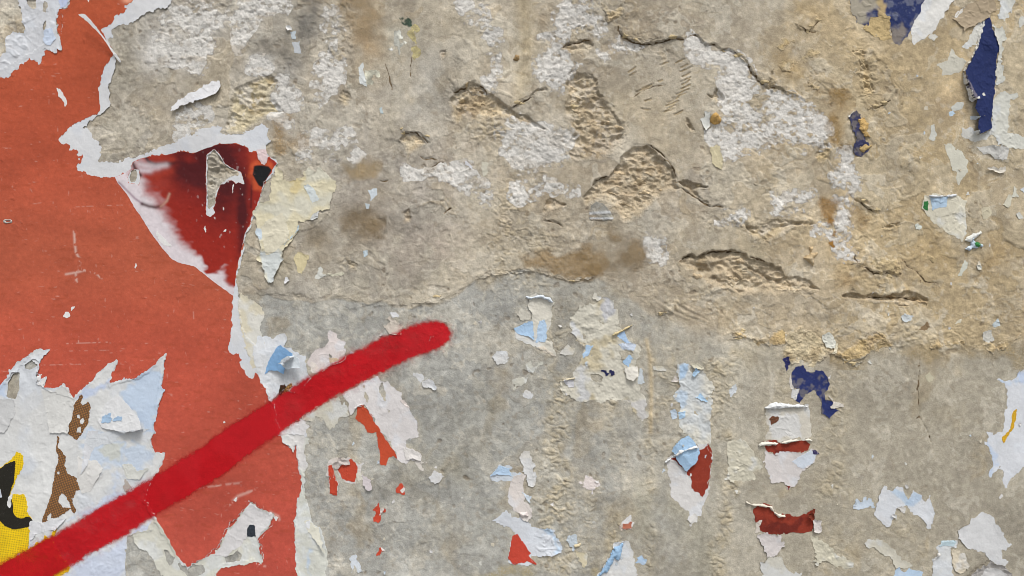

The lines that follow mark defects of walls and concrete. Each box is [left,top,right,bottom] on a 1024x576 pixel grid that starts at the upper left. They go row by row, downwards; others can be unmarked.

spalling [448,0,905,278]
spalling [643,236,820,298]
crack [851,255,936,301]